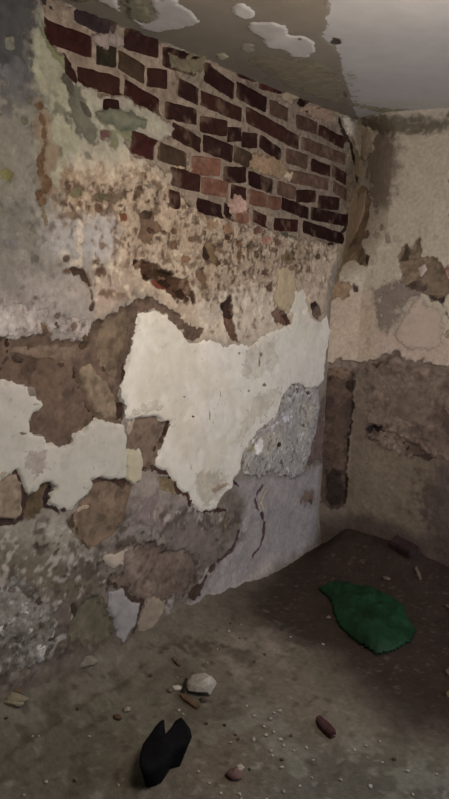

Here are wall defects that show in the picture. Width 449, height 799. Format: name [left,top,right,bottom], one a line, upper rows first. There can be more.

crack [150,465,270,600]
spalling [0,0,449,549]